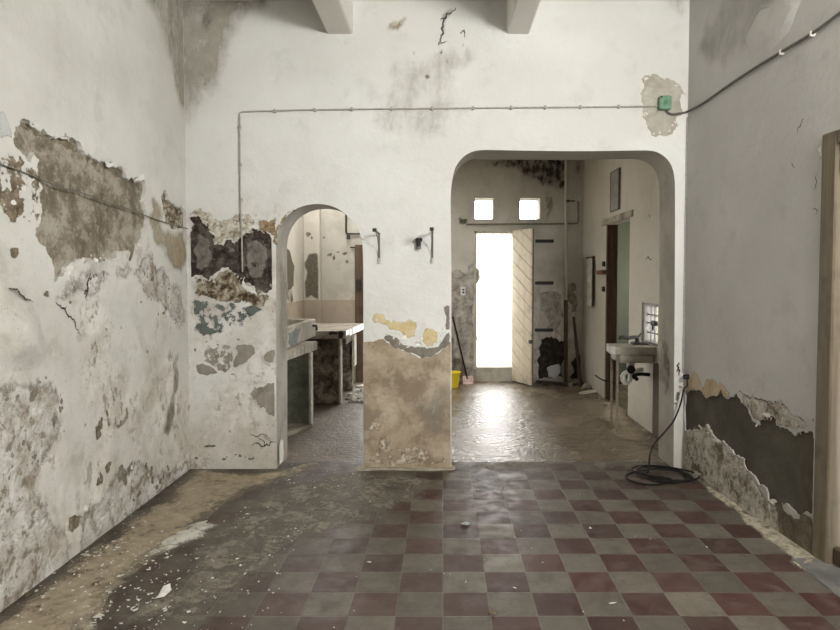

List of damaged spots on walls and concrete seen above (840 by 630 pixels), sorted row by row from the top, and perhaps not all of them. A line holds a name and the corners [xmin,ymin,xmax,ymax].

damp [154,0,248,105]
crack [438,8,465,45]
flaking render [640,74,686,137]
flaking render [0,112,185,326]
damp [494,160,565,188]
peeling [0,376,198,612]
flaking render [161,191,296,376]
flaking render [250,383,274,416]
flaking render [363,264,480,467]
flaking render [537,283,581,379]
flaking render [674,371,814,530]